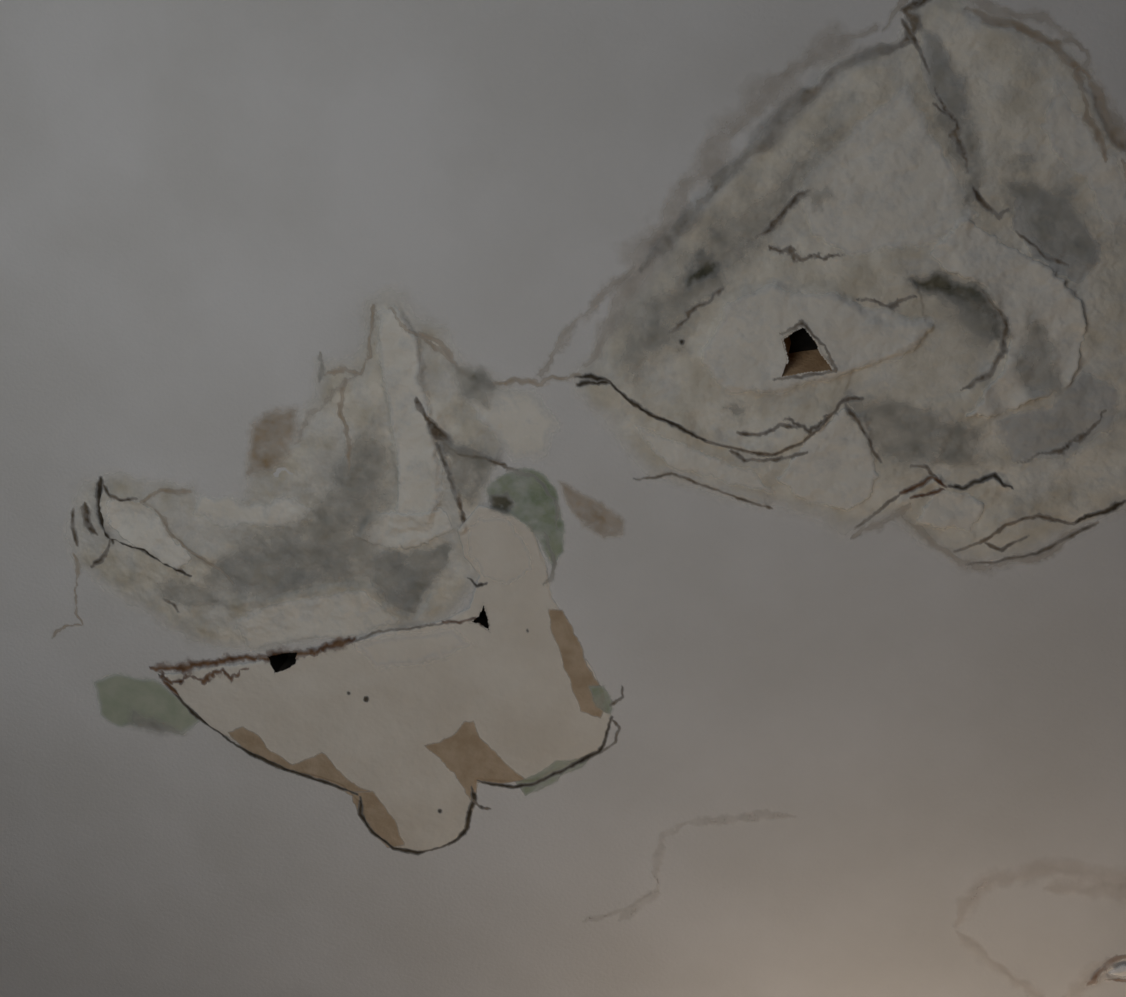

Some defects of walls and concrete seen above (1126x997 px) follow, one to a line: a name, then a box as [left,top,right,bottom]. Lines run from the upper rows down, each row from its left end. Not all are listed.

flaking render [774,320,838,381]
flaking render [95,468,612,851]